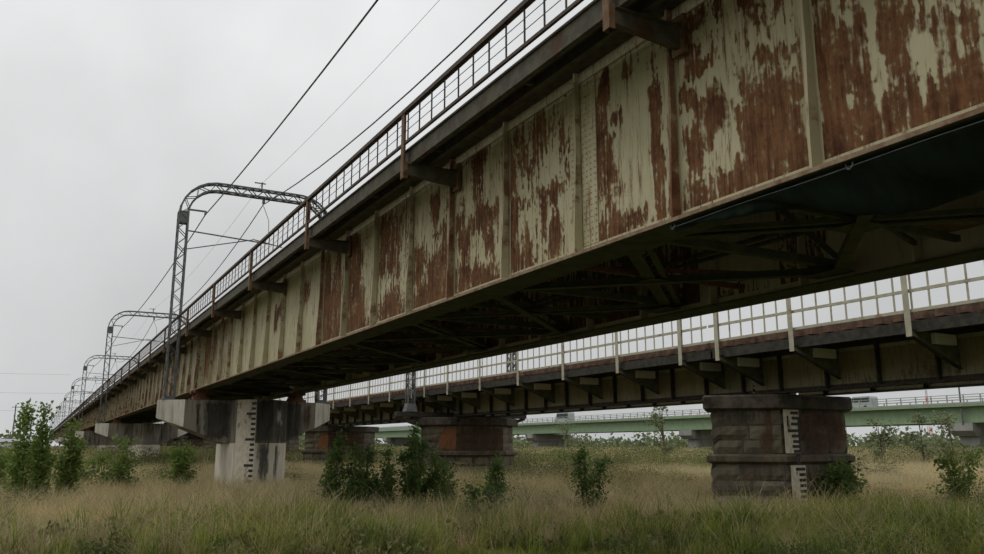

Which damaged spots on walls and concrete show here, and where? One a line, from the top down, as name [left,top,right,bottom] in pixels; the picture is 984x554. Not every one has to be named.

corrosion [591,0,809,245]
corrosion [811,0,984,160]
corrosion [304,94,572,342]
leakage [203,401,230,439]
leakage [256,399,301,485]